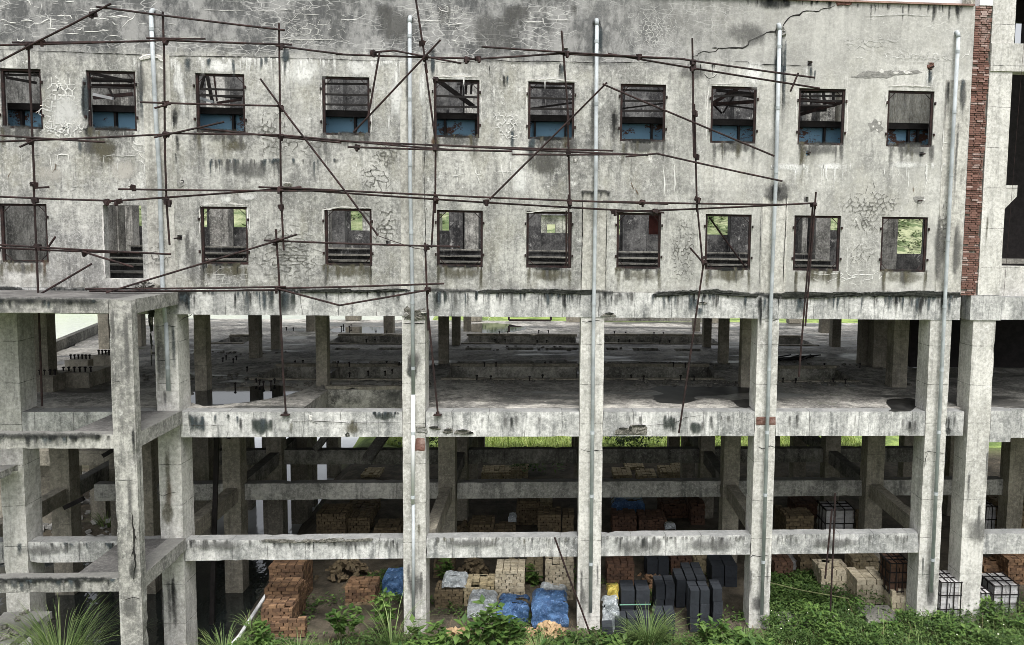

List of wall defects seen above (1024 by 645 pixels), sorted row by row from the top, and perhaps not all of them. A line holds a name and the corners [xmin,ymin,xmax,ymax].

crack [0,0,835,249]
water stain [209,158,315,176]
crack [759,130,946,285]
water stain [745,297,781,325]
water stain [189,415,292,433]
water stain [690,416,730,433]
crack [121,515,139,600]